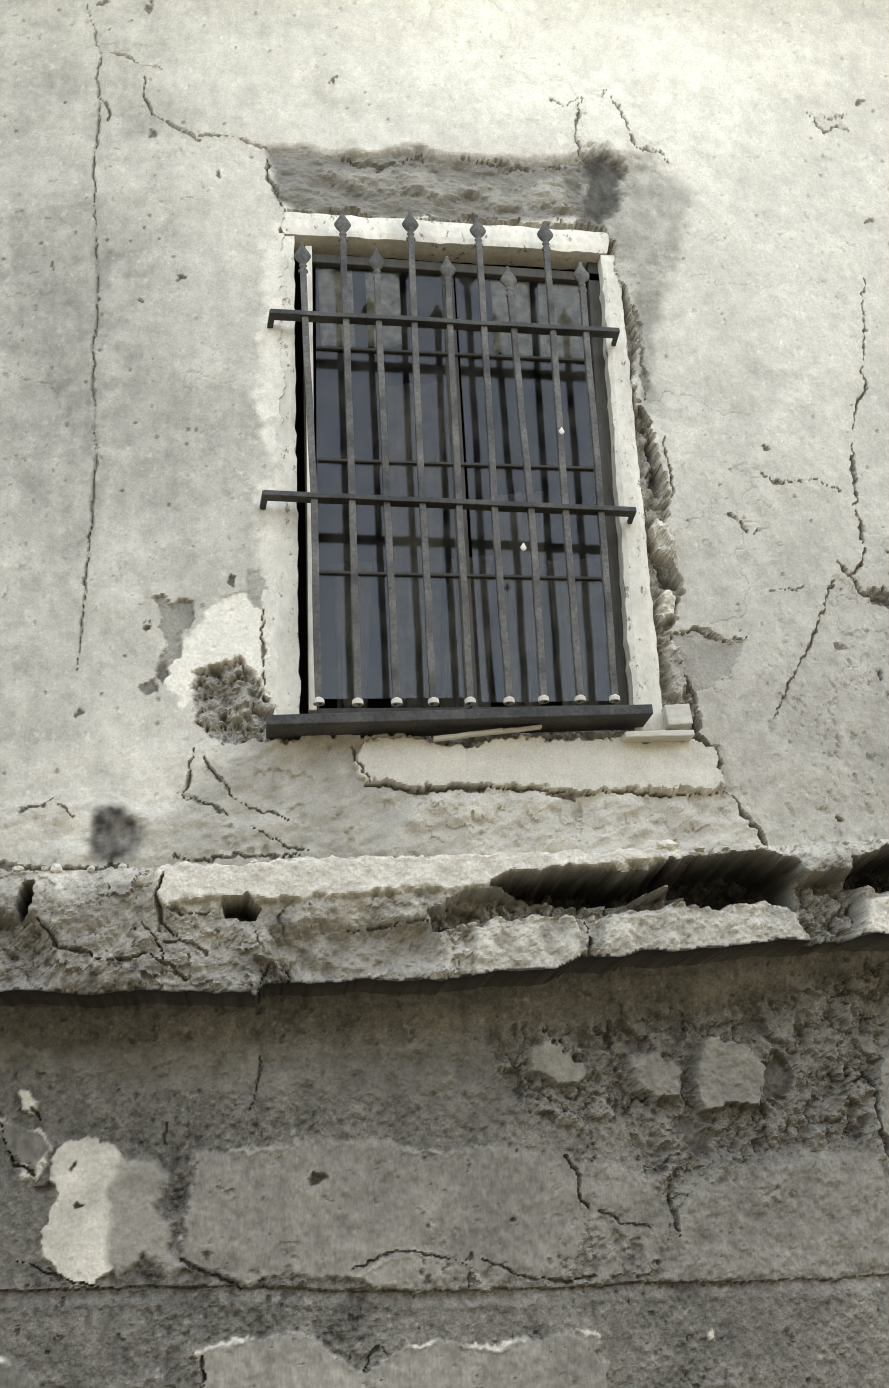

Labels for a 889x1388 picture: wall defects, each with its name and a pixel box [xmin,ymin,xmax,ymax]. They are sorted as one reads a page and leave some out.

crack [339,86,671,175]
crack [75,3,287,688]
flaking render [267,145,749,844]
crack [756,276,889,716]
flaking render [139,569,274,706]
spalling [0,883,54,986]
spalling [223,893,260,922]
spalling [254,852,889,1003]
flaking render [2,1046,889,1289]
crack [852,1069,889,1157]
crack [179,1256,244,1289]
crack [350,1248,599,1291]